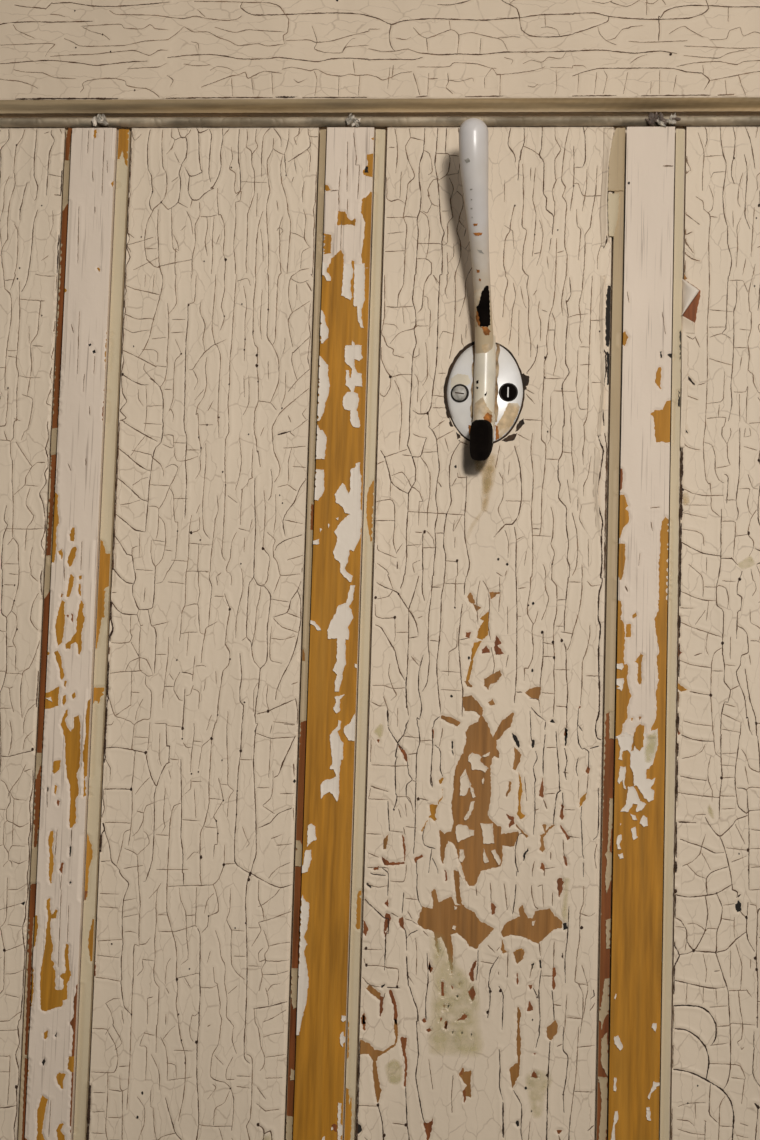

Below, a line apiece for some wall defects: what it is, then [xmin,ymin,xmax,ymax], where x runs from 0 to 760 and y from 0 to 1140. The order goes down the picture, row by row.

peeling [52,203,69,428]
peeling [22,455,110,1140]
crack [0,127,628,1140]
peeling [286,192,407,1140]
peeling [363,154,373,177]
crack [0,0,760,100]
peeling [373,834,423,870]
peeling [459,1068,472,1103]
peeling [383,592,570,1090]
peeling [619,469,629,580]
peeling [597,517,687,1140]
crack [651,127,760,1140]